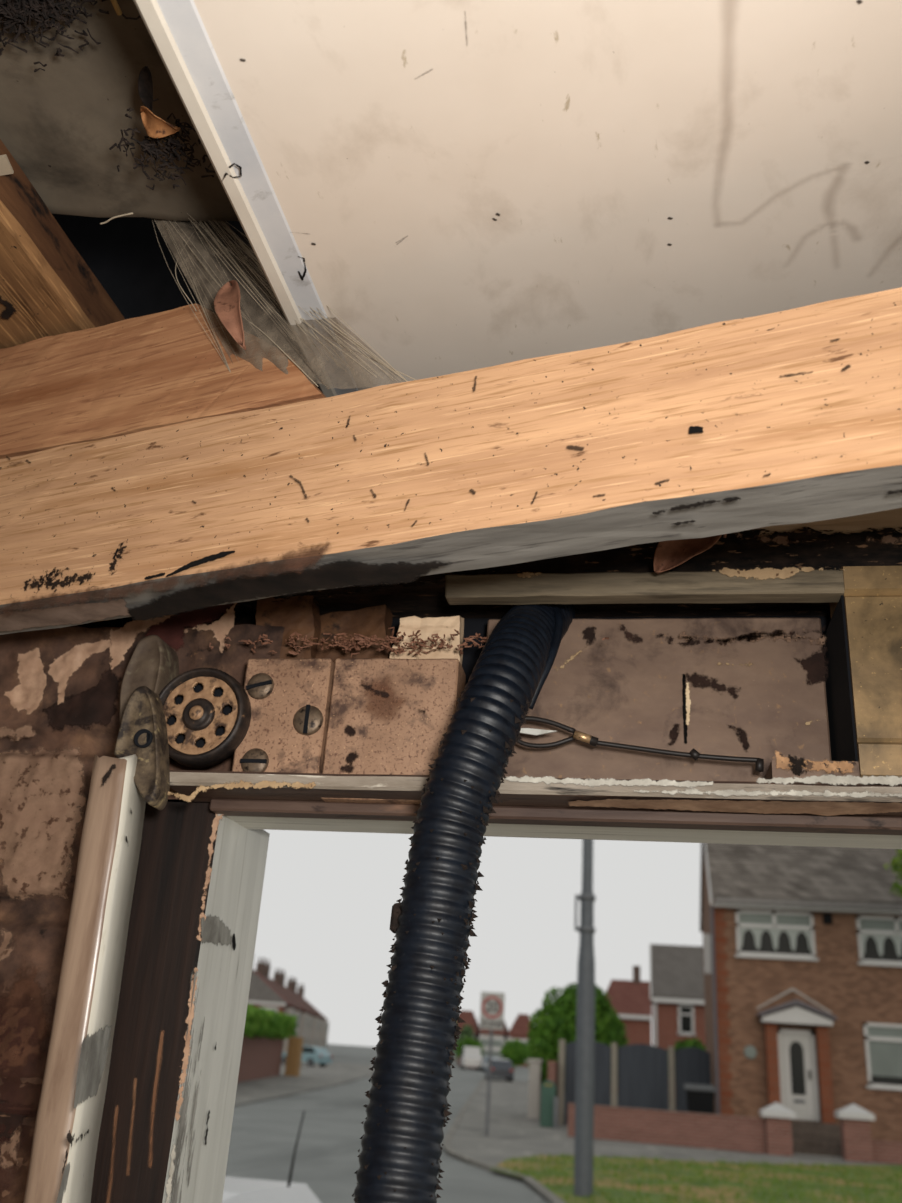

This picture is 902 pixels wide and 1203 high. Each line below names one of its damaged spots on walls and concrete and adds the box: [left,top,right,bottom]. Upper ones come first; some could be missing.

damp [0,541,451,632]
peeling [712,567,823,580]
peeling [0,603,239,900]
peeling [168,780,316,802]
spalling [0,928,13,961]
spalling [0,969,48,1072]
peeling [74,1025,111,1109]
spalling [0,1127,22,1168]
peeling [56,1129,89,1203]